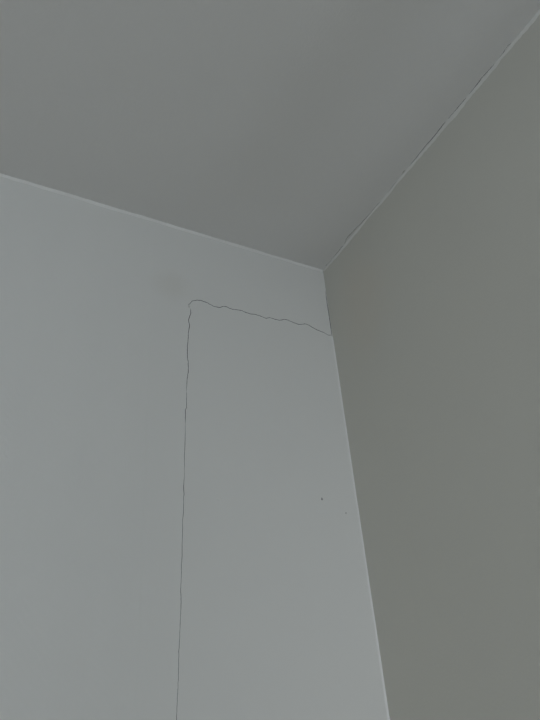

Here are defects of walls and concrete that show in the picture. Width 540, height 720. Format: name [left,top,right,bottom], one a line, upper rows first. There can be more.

crack [175,291,332,720]